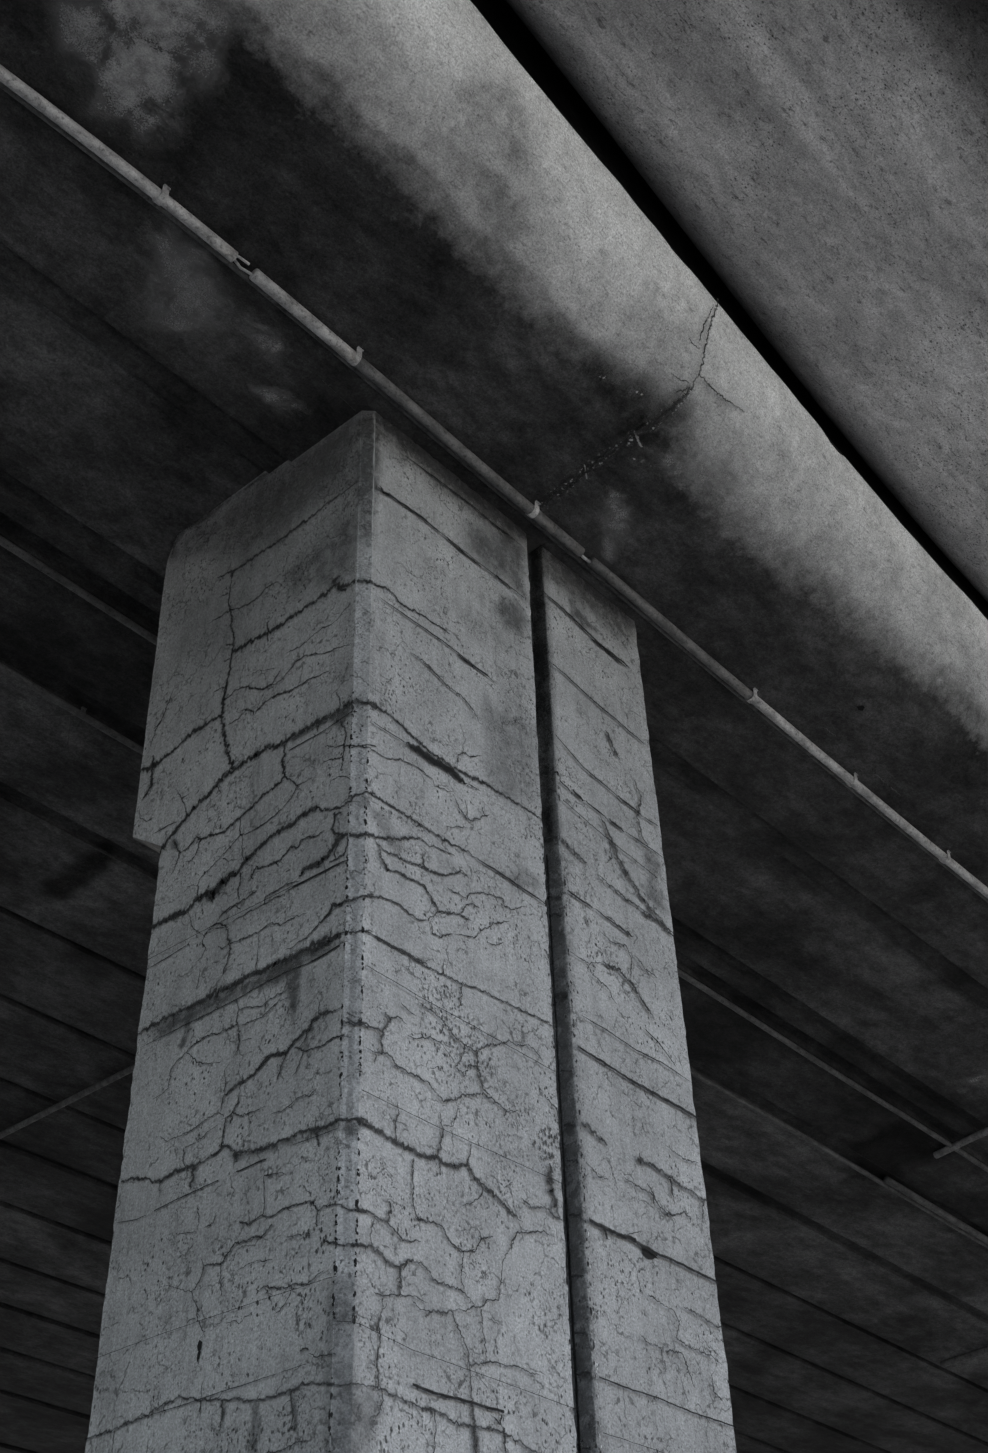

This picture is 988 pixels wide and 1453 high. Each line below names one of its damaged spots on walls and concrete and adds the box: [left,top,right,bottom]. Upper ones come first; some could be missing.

crack [538,297,743,509]
crack [85,482,707,1453]
crack [639,1293,724,1401]